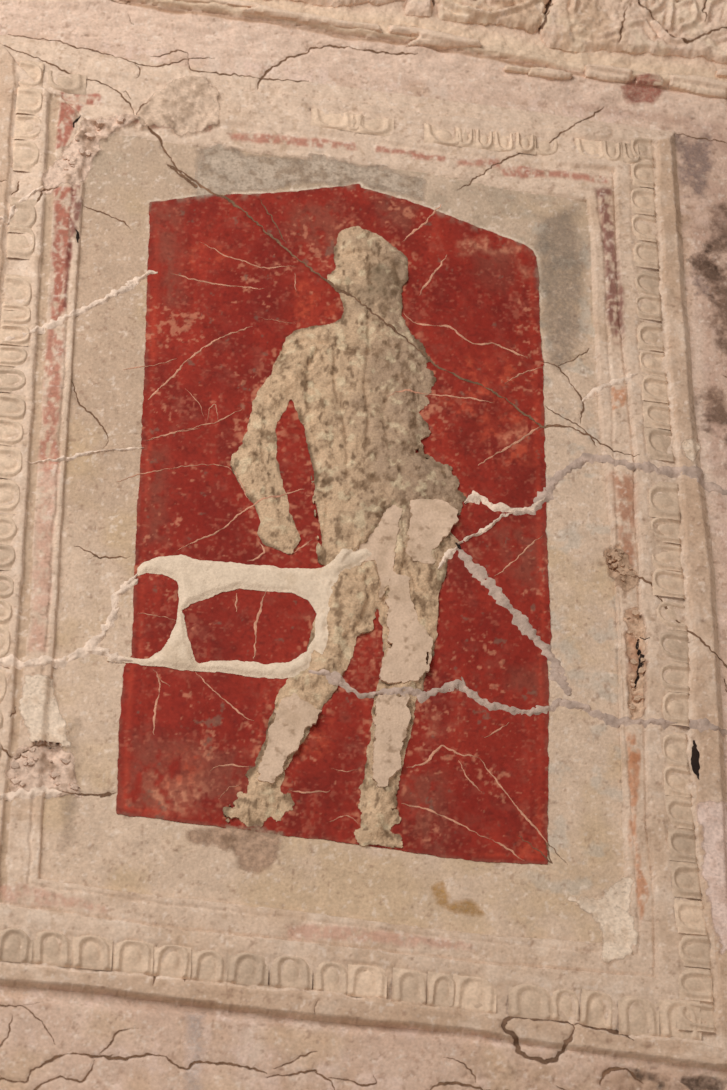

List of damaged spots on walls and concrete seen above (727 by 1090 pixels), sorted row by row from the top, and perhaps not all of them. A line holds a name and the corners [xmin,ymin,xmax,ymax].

flaking render [39,76,220,194]
water stain [693,205,727,350]
water stain [700,391,727,431]
crack [0,34,727,863]
flaking render [603,544,639,592]
flaking render [623,607,647,720]
crack [0,1002,377,1090]
crack [430,1057,483,1090]
crack [501,1016,634,1090]
crack [600,1067,643,1084]
water stain [681,1077,720,1090]